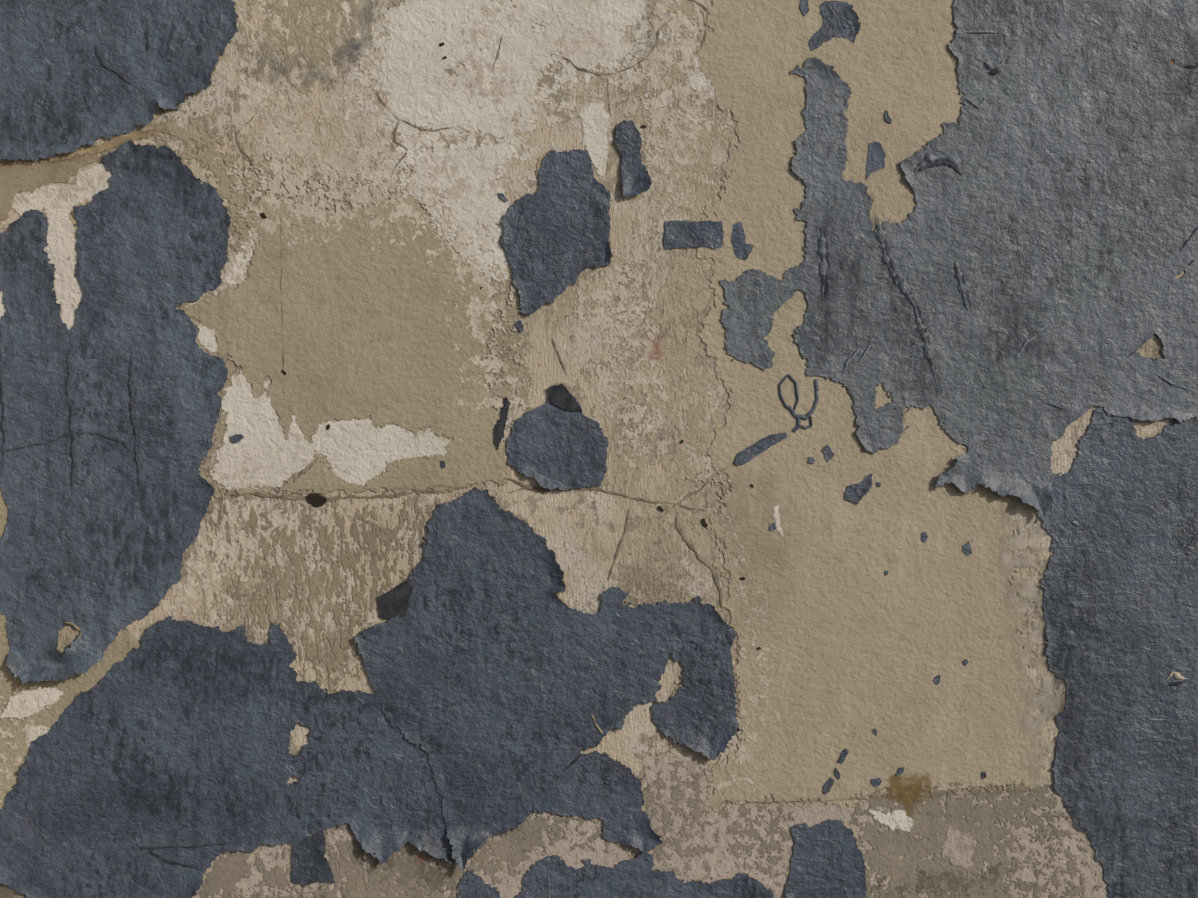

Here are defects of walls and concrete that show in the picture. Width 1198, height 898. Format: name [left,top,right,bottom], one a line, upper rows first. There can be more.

crack [491,33,503,73]
crack [553,0,708,115]
crack [374,89,454,177]
peeling [349,498,412,612]
peeling [407,530,417,573]
peeling [414,502,429,545]
crack [214,464,731,612]
peeling [302,623,323,687]
peeling [323,598,363,679]